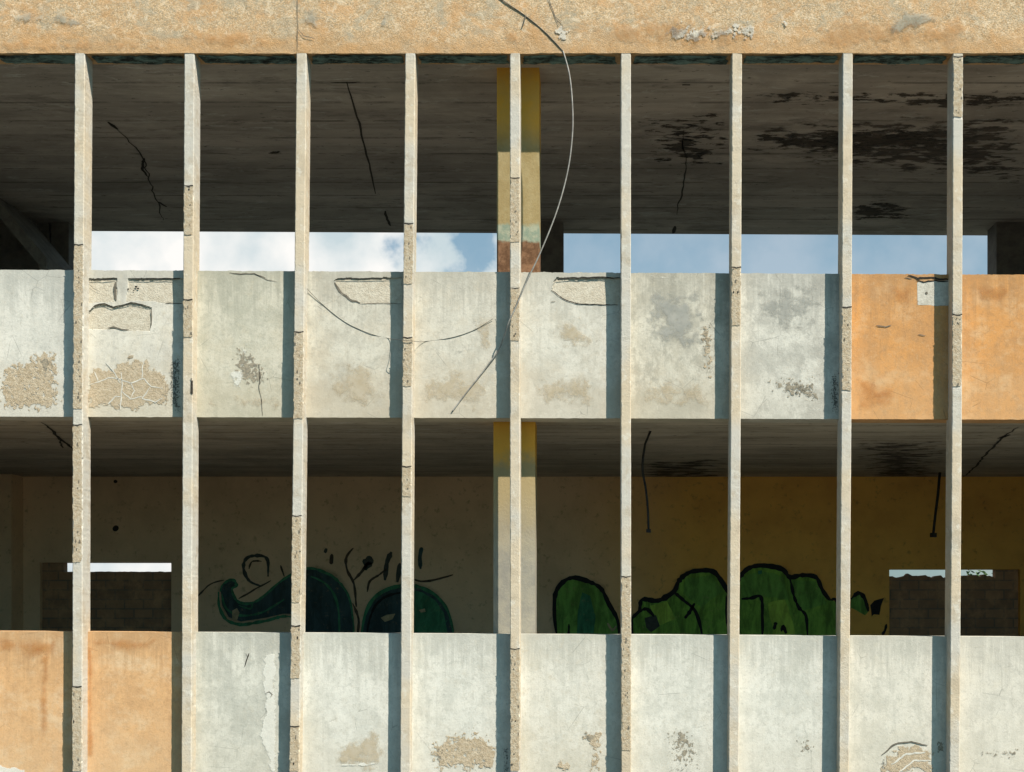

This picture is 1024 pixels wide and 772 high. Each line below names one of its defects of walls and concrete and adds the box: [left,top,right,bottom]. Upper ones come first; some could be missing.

crack [108,122,167,220]
crack [331,82,391,226]
crack [669,131,702,234]
damp [646,114,727,165]
damp [747,124,839,164]
damp [852,92,947,174]
damp [963,92,1024,183]
peeling [0,244,193,412]
spalling [334,223,414,304]
spalling [551,276,621,305]
crack [40,422,73,449]
peeling [431,727,496,772]